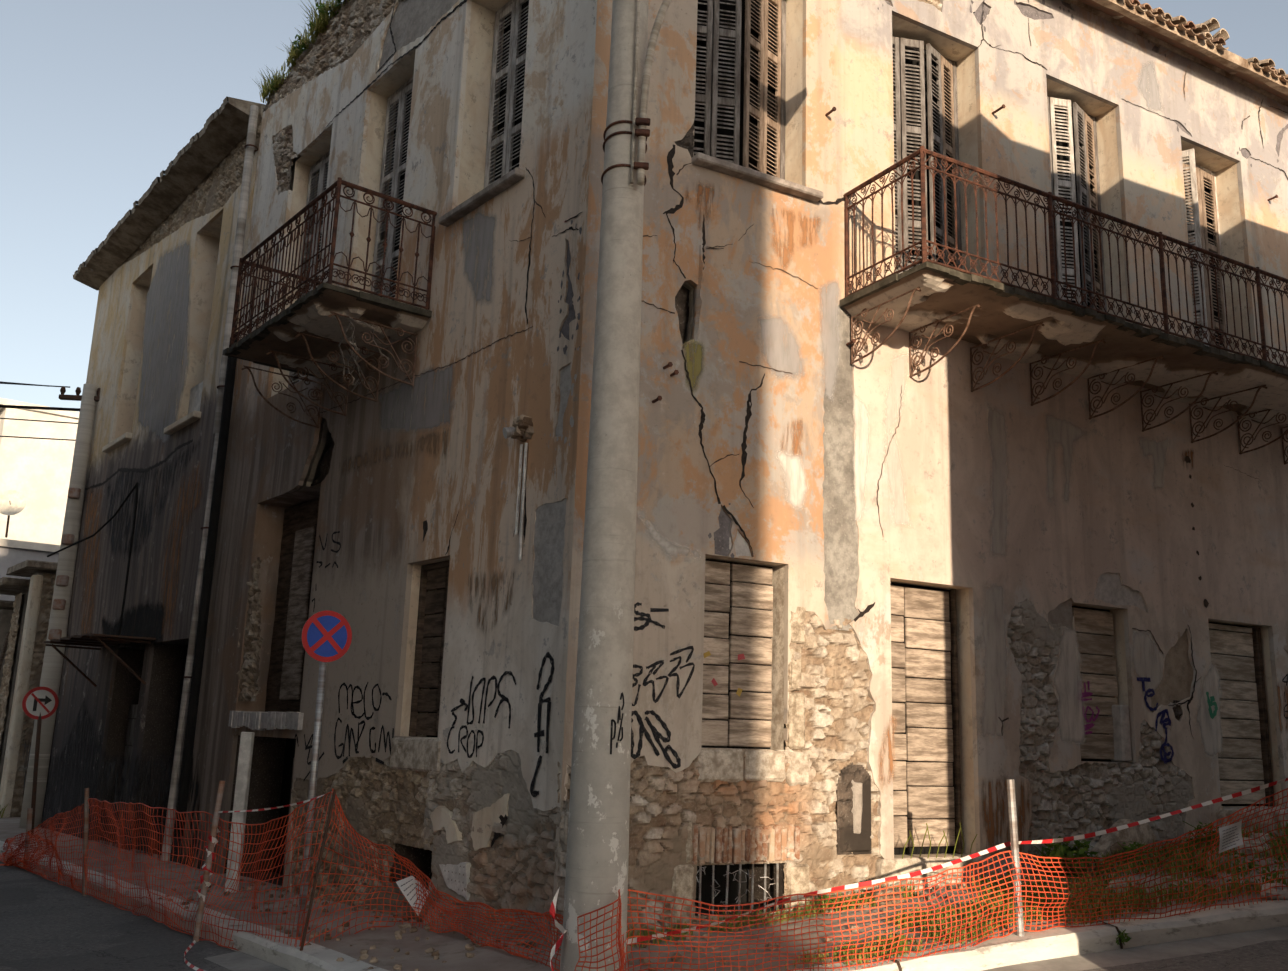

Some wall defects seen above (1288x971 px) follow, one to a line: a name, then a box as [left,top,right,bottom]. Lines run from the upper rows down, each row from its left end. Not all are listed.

crack [976,0,1047,70]
leakage [463,213,495,301]
crack [643,145,818,289]
crack [681,350,793,555]
peeling [822,305,859,631]
crack [877,386,902,533]
spalling [1172,700,1183,721]
peeling [430,793,510,900]